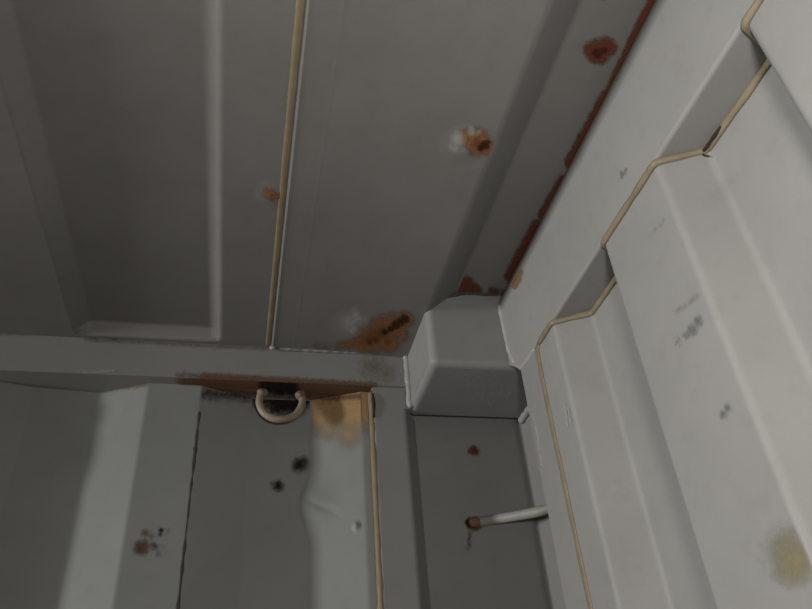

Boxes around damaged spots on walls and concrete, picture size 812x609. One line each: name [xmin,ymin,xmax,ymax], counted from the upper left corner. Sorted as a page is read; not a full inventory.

rust [454,0,655,295]
rust [314,310,414,353]
rust [178,373,376,445]
rust [293,458,308,471]
water stain [777,540,809,579]